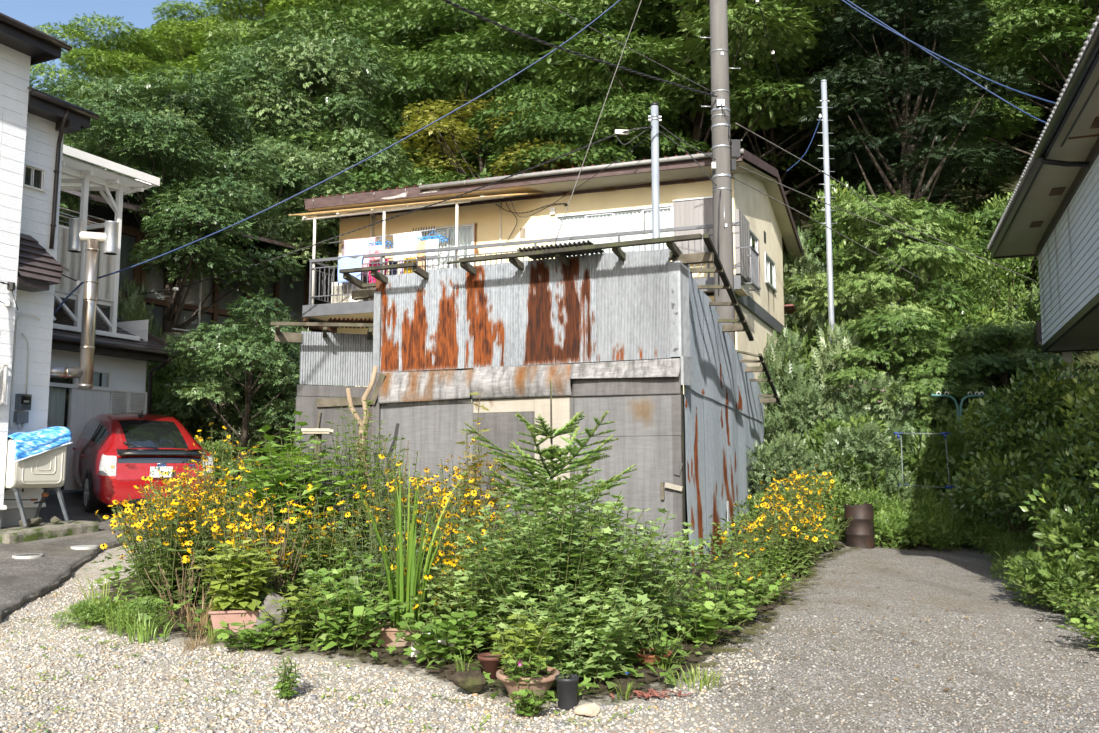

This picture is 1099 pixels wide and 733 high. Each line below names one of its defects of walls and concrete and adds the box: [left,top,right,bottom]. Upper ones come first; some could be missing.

rust [377,223,505,401]
rust [517,256,600,386]
rust [685,364,742,573]